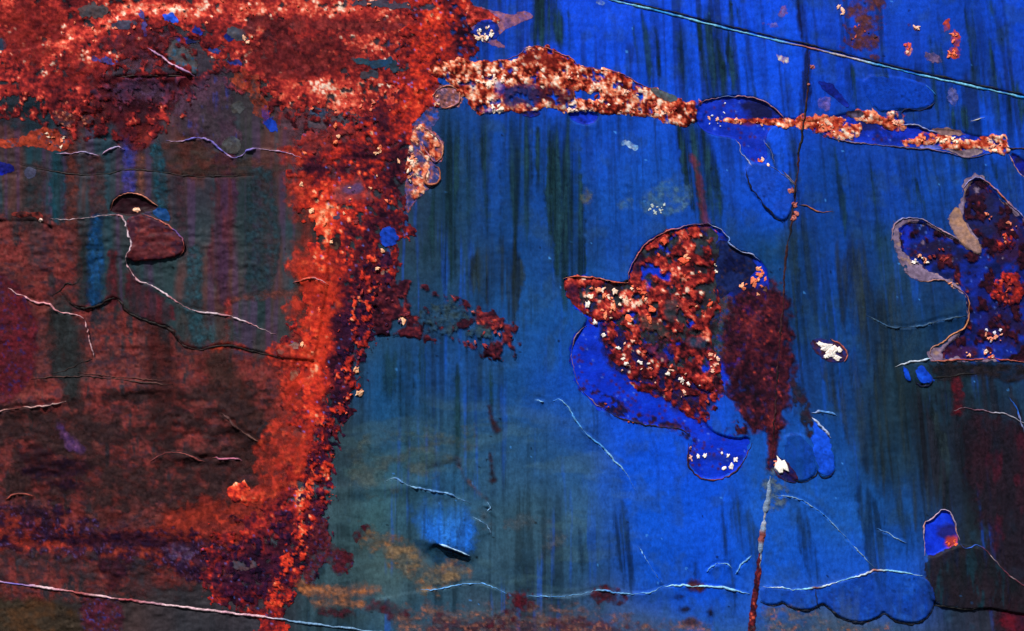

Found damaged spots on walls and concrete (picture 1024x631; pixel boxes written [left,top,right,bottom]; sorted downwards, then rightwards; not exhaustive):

crack [25,137,301,178]
corrosion [770,108,1024,158]
crack [51,214,272,334]
corrosion [0,0,702,631]
peeling [564,222,770,481]
crack [535,51,874,631]
corrosion [708,280,814,470]
peeling [810,338,848,362]
peeling [891,173,1024,387]
peeling [769,410,837,483]
crack [421,583,507,594]
peeling [761,509,1024,626]